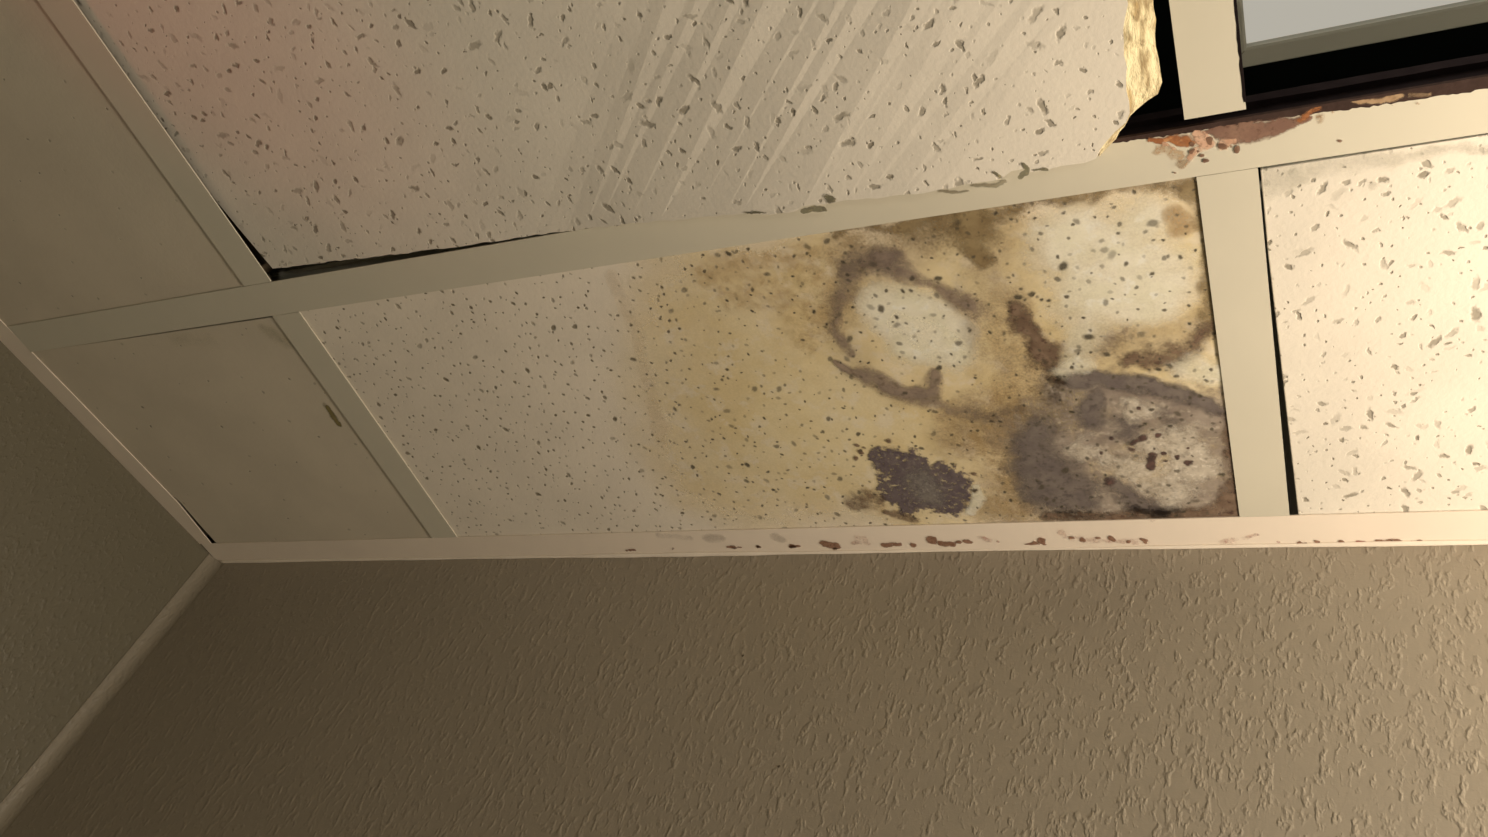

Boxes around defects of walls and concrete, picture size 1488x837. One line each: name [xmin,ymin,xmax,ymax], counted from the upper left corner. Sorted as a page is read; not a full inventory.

rust [1113,0,1488,174]
water stain [670,177,1239,524]
rust [820,540,841,550]
rust [881,536,999,548]
rust [1069,536,1148,544]